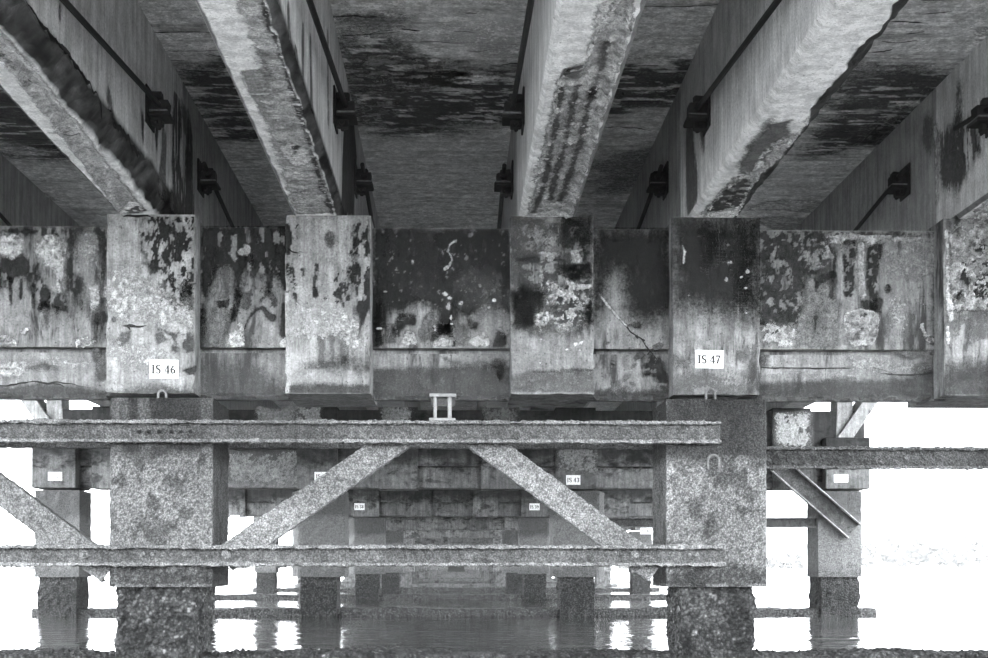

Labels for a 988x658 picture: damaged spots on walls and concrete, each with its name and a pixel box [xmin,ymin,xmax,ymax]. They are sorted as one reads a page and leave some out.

damp [334,11,523,139]
damp [0,56,988,447]
crack [0,367,88,388]
crack [624,322,657,360]